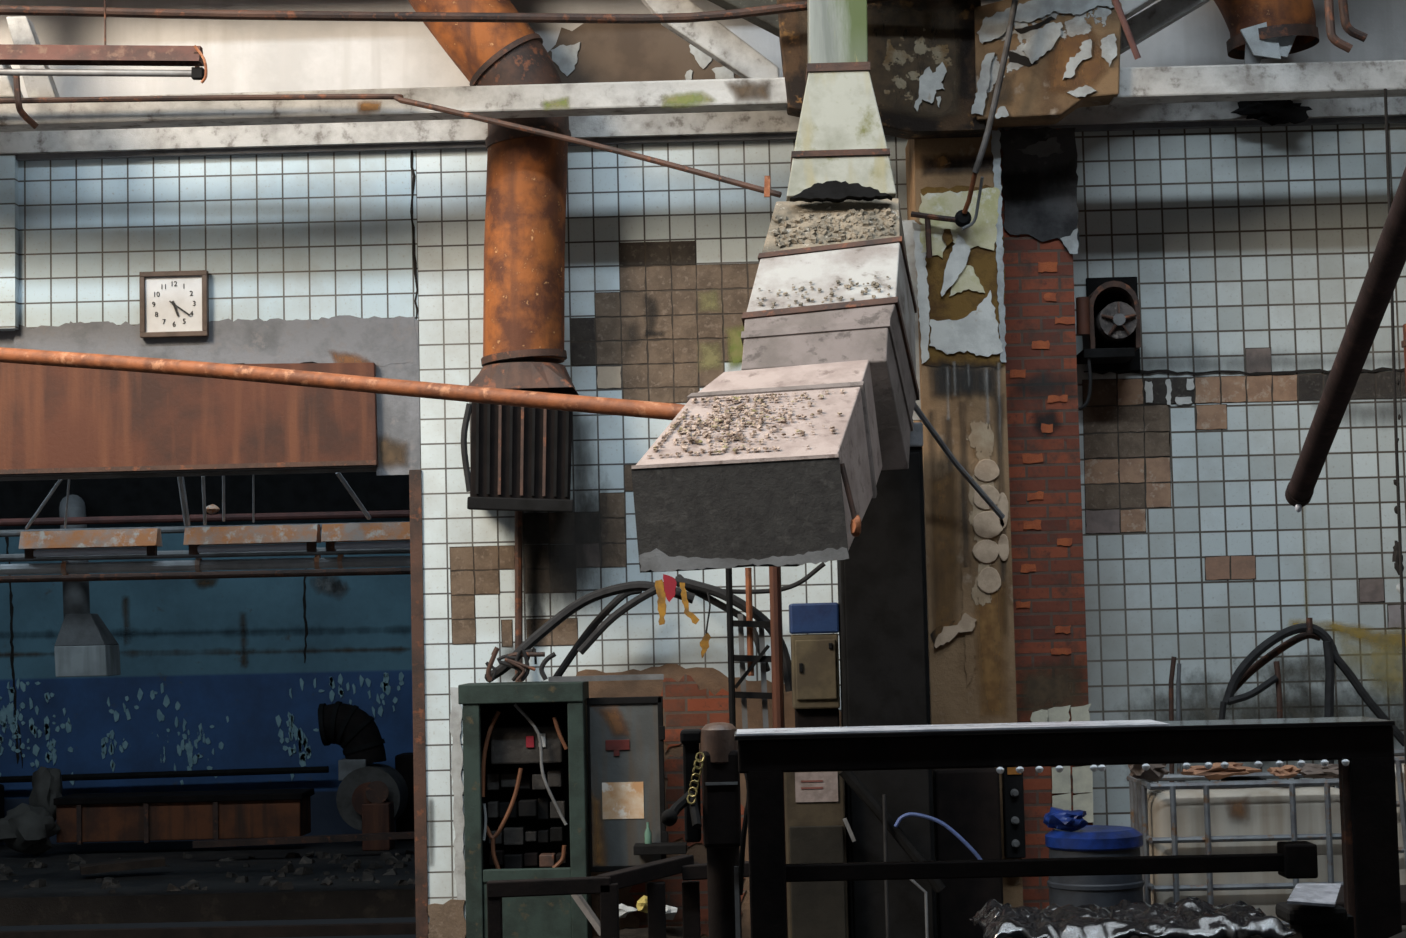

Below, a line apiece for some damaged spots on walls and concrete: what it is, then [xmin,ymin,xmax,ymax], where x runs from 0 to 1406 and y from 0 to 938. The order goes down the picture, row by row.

peeling [912,0,1117,378]
peeling [570,241,759,403]
peeling [966,420,997,545]
spalling [1041,423,1053,433]
peeling [1047,347,1330,546]
peeling [1350,371,1406,400]
spalling [930,563,992,685]
peeling [0,679,73,768]
peeling [101,683,229,785]
peeling [275,672,404,780]
leakage [736,657,1404,744]